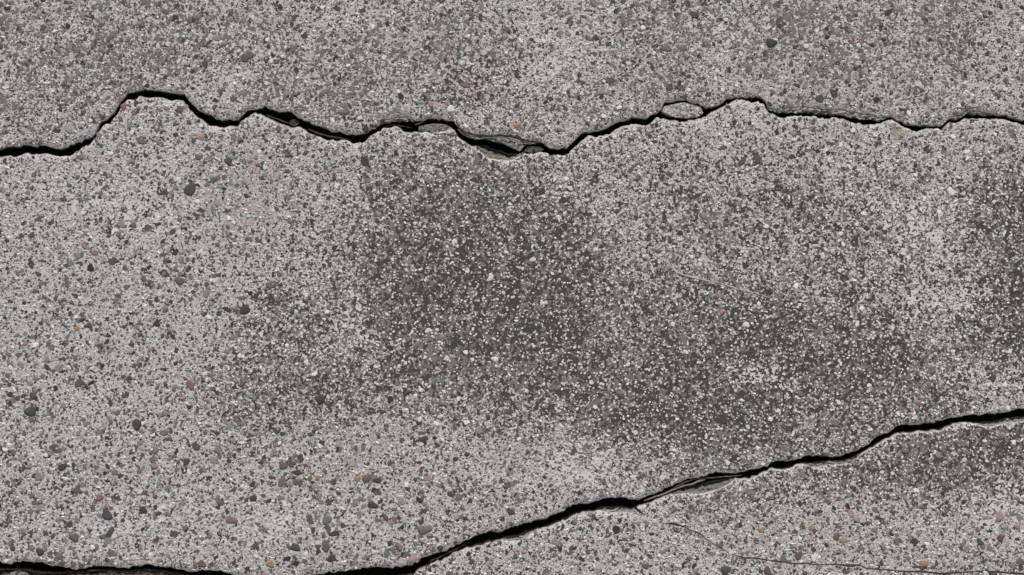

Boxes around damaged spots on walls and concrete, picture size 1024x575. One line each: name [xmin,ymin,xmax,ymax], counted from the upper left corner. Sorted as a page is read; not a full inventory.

crack [0,43,1024,270]
crack [0,561,232,575]
crack [316,409,1024,575]